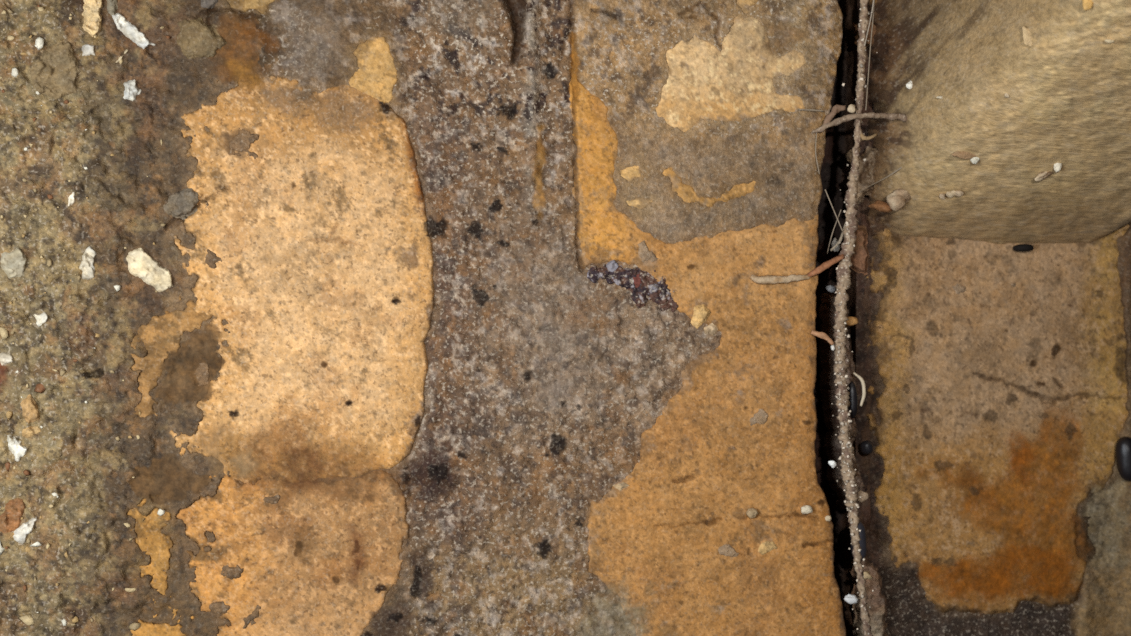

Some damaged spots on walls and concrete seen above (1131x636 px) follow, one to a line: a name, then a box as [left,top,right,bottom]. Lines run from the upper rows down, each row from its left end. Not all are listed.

leakage [543,62,557,79]
peeling [123,80,141,101]
leakage [498,104,516,120]
leakage [488,200,502,212]
leakage [424,218,447,237]
leakage [468,222,482,239]
leakage [471,285,496,306]
spalling [126,36,435,636]
spalling [569,74,846,636]
leakage [546,434,565,456]
leakage [537,540,550,559]
leakage [361,555,436,636]